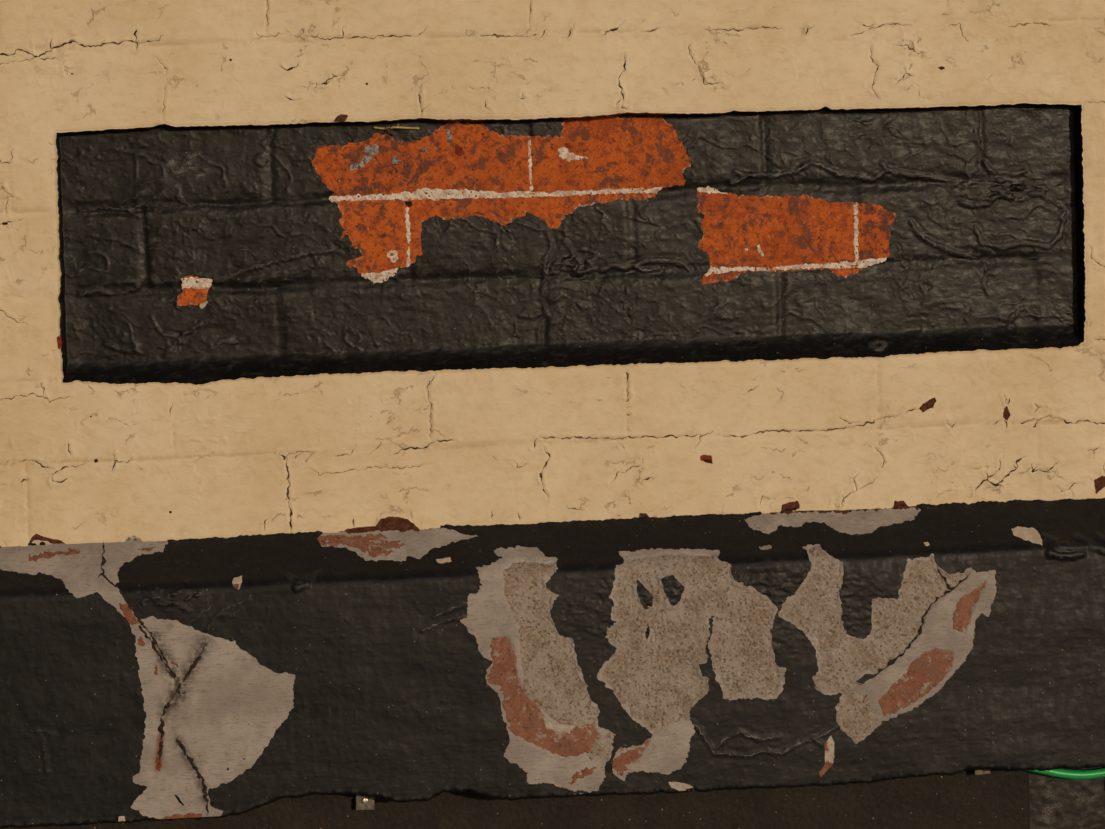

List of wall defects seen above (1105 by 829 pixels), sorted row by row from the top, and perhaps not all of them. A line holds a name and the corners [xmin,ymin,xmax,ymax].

crack [251,0,426,42]
crack [0,30,168,115]
peeling [311,115,691,284]
peeling [697,186,897,285]
crack [264,378,451,532]
peeling [317,516,477,563]
crack [517,372,915,511]
peeling [744,501,921,550]
crack [935,457,1076,500]
crack [993,399,1105,471]
peeling [0,534,295,821]
peeling [460,542,997,794]